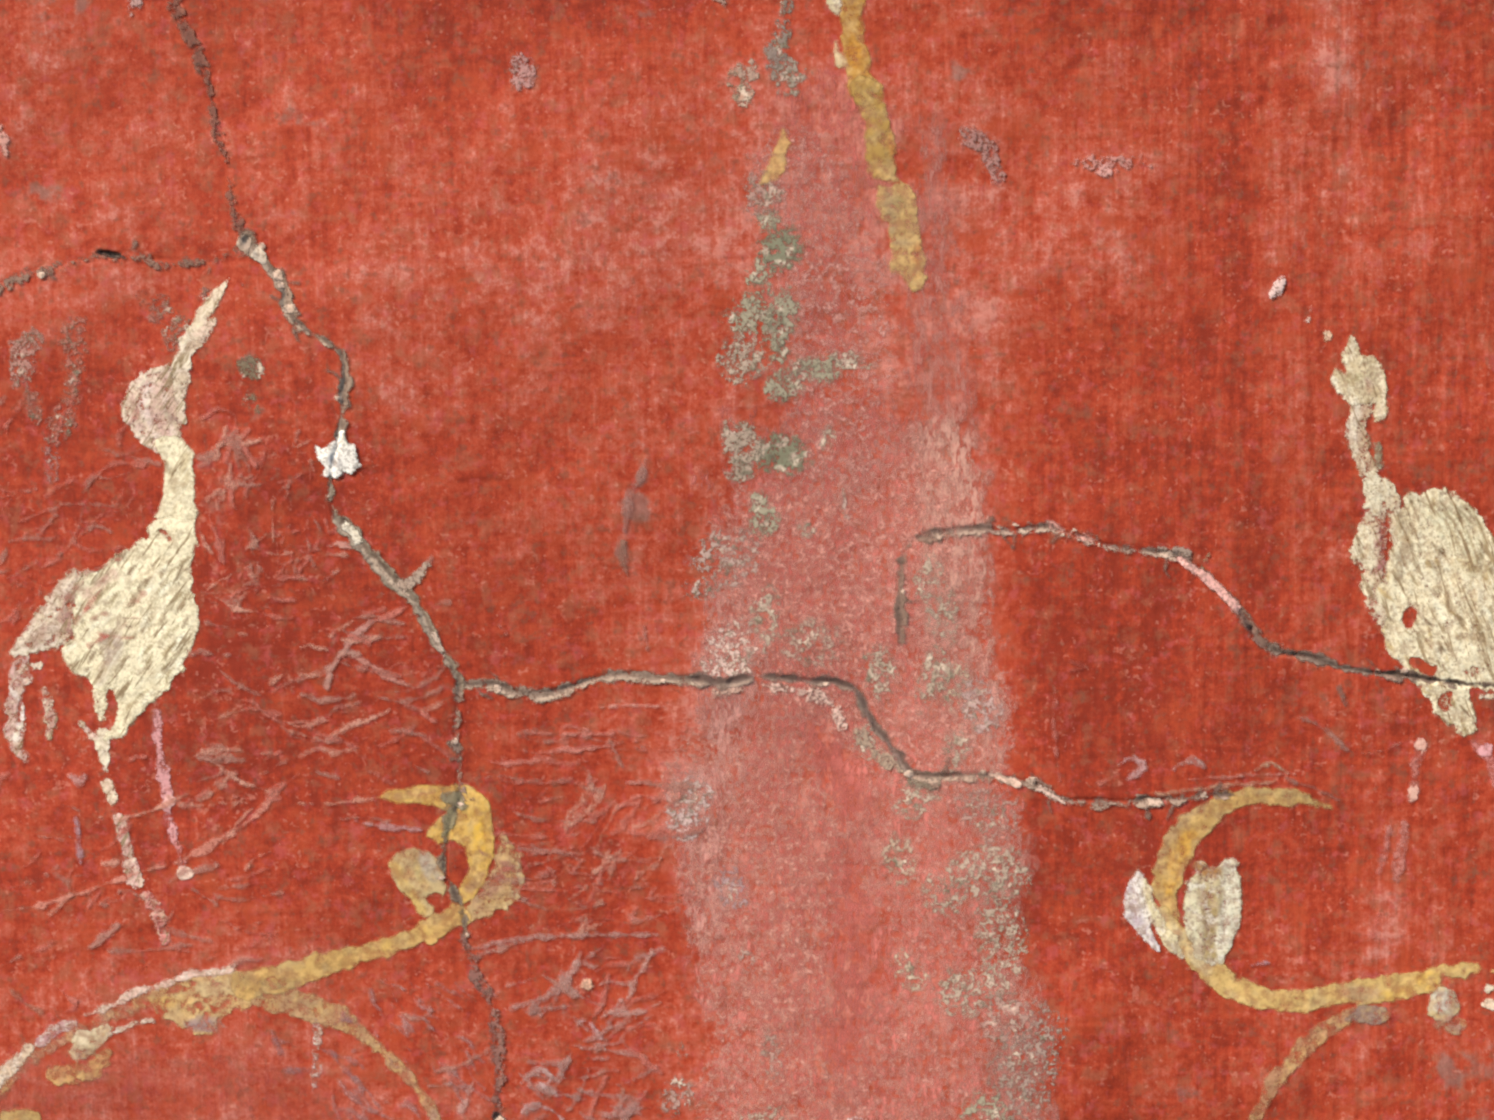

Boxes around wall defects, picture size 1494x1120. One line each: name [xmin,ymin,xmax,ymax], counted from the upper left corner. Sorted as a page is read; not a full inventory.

crack [0,0,354,439]
peeling [716,171,872,402]
crack [327,475,1234,1120]
water stain [662,70,1058,1120]
crack [893,516,1494,689]